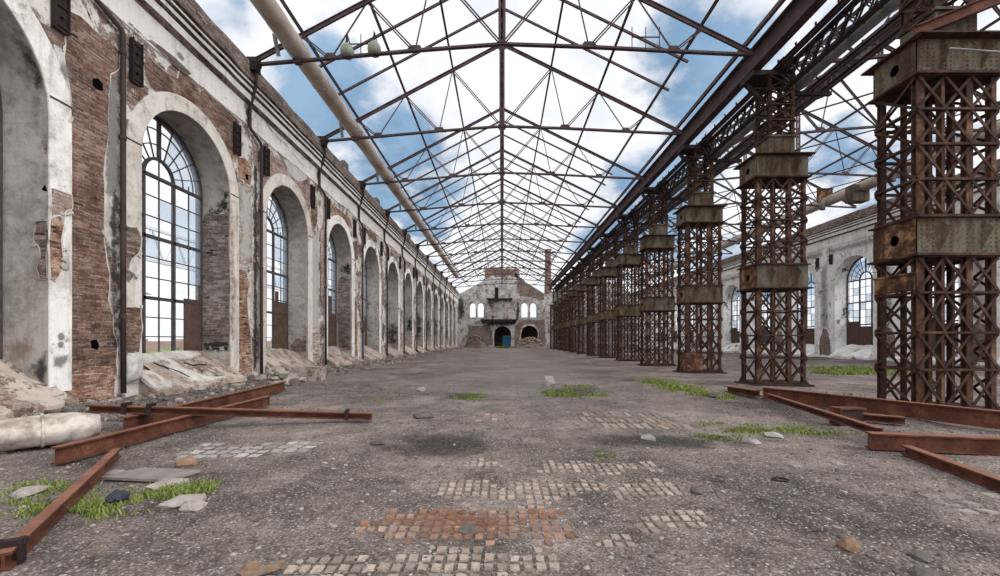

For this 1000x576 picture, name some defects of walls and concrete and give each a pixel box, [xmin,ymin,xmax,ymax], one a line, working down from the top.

flaking render [31,11,143,402]
water stain [107,78,120,347]
flaking render [144,40,352,374]